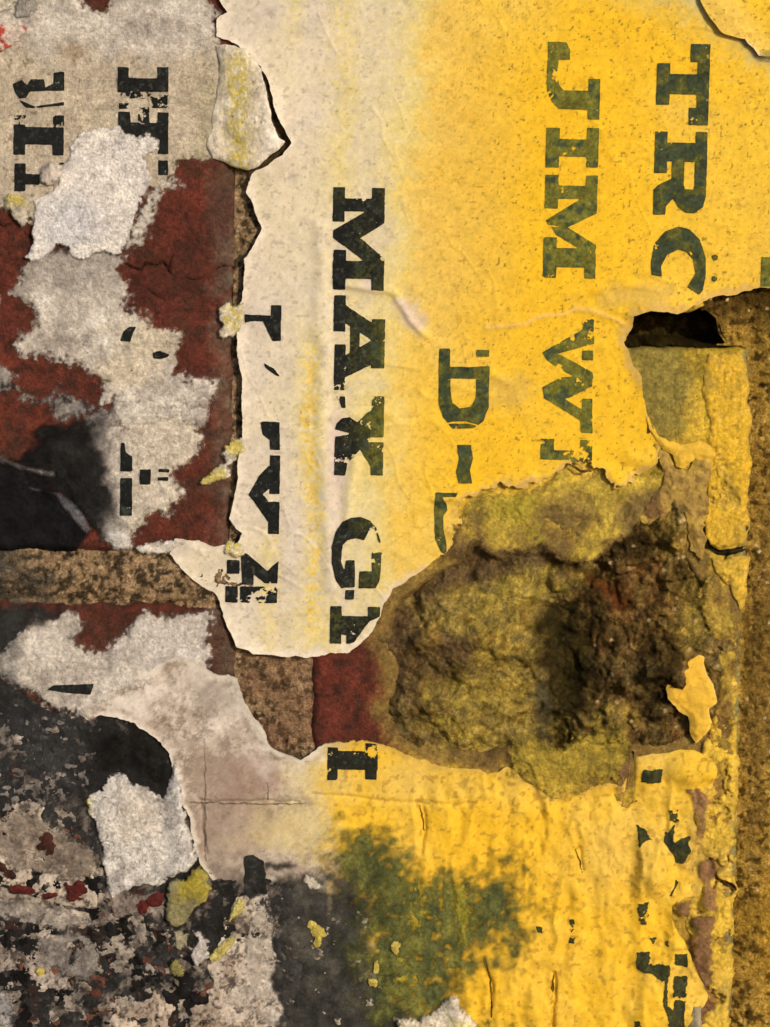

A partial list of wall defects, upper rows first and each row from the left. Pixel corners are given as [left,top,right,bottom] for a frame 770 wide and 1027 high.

peeling [0,0,38,52]
peeling [207,44,285,170]
peeling [5,126,159,262]
peeling [219,303,245,338]
peeling [201,437,245,485]
peeling [646,352,752,612]
peeling [224,541,245,558]
spalling [378,500,743,1027]
peeling [87,762,236,977]
peeling [303,875,320,890]
peeling [227,898,245,922]